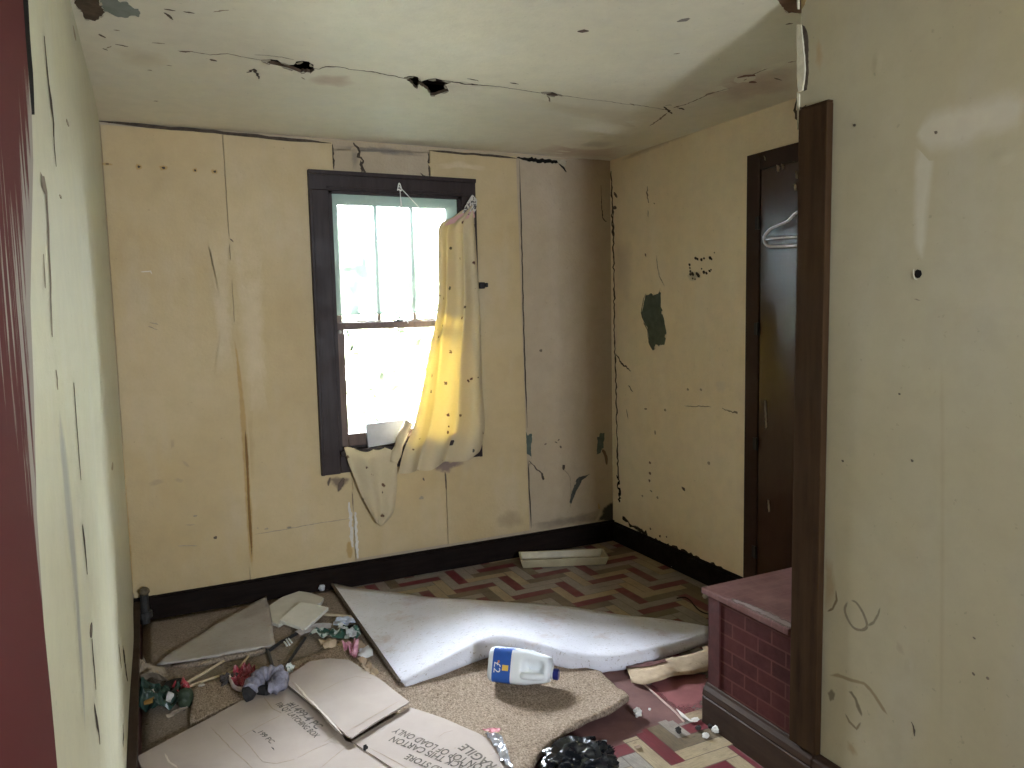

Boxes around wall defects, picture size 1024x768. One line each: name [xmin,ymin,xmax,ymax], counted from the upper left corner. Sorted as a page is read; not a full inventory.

peeling [74,0,140,21]
crack [188,51,405,79]
crack [452,61,795,125]
crack [332,143,366,172]
crack [601,173,633,502]
peeling [642,289,667,350]
peeling [526,430,562,458]
spalling [562,465,589,506]